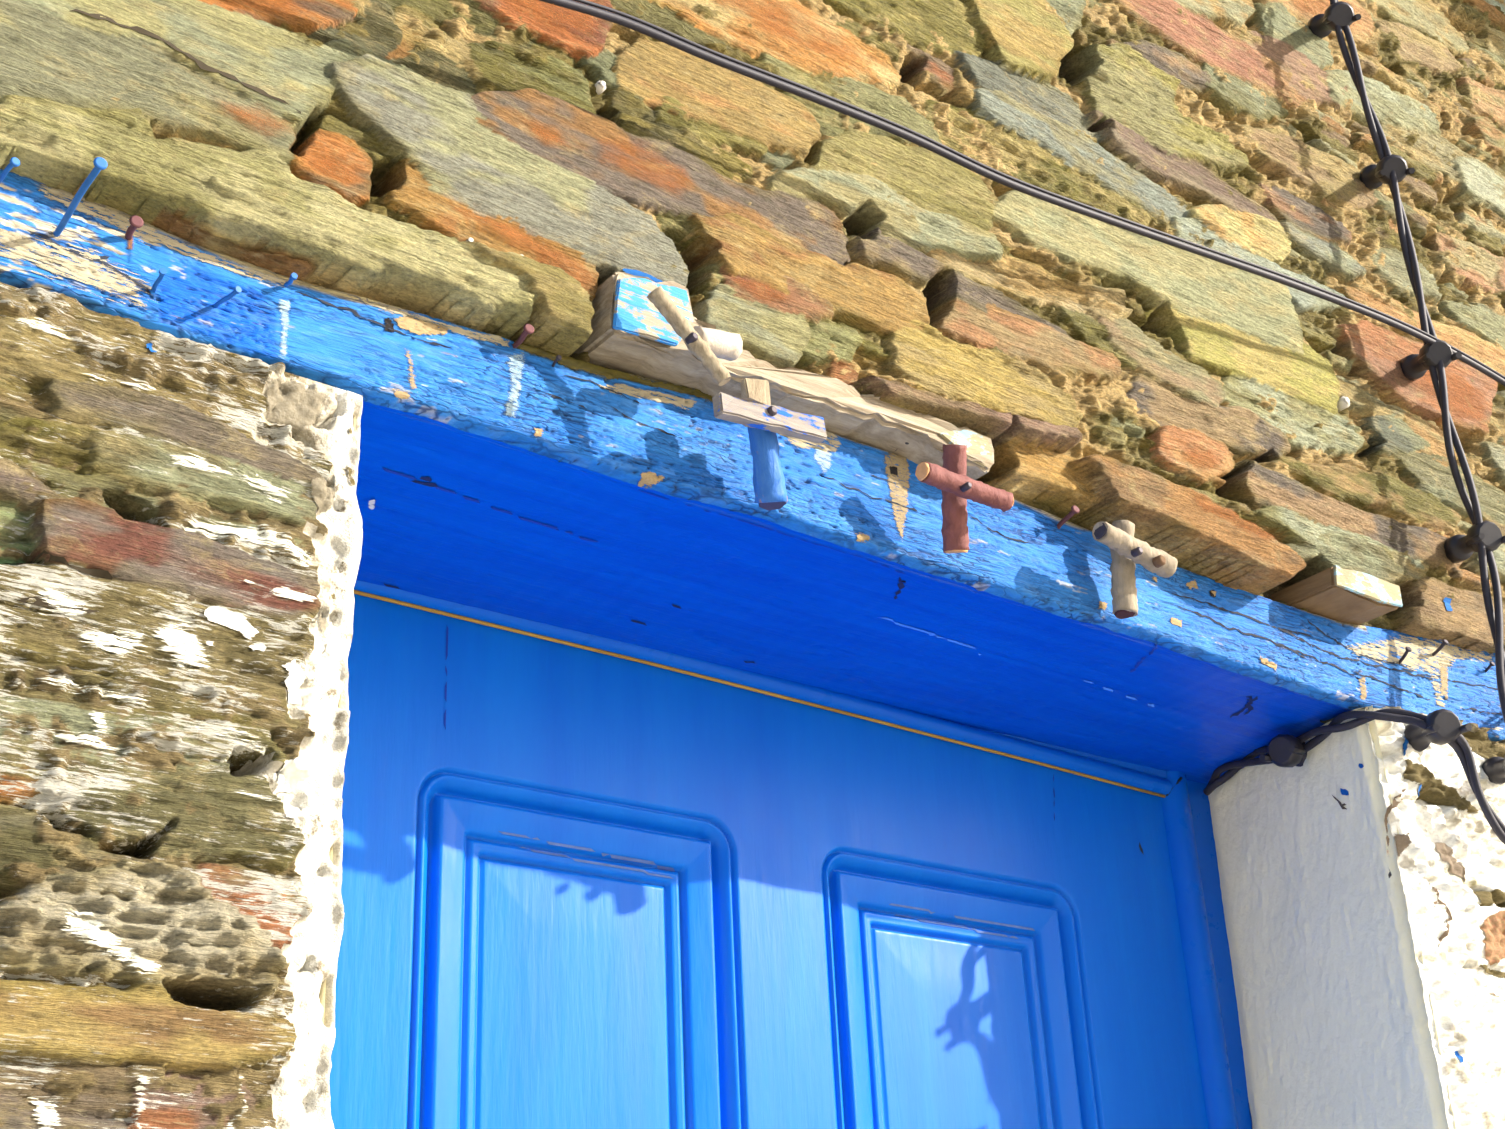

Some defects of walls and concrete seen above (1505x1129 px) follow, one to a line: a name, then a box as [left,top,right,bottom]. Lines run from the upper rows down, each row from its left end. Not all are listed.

peeling [0,228,158,310]
peeling [36,184,286,288]
peeling [367,303,510,347]
peeling [600,383,697,410]
peeling [170,448,292,504]
peeling [181,511,311,567]
peeling [39,582,267,671]
peeling [245,579,335,633]
peeling [1344,635,1494,707]
peeling [35,675,153,755]
peeling [1403,759,1479,813]
peeling [1435,842,1505,978]